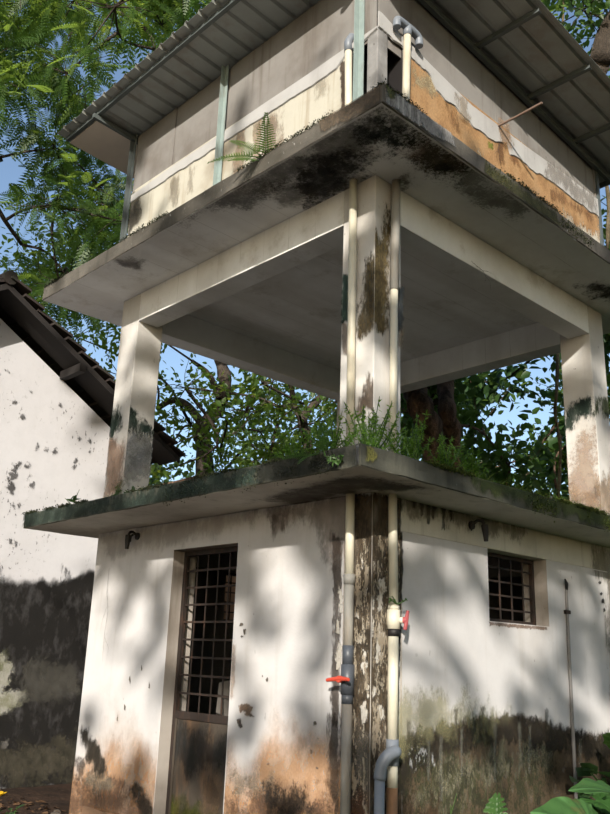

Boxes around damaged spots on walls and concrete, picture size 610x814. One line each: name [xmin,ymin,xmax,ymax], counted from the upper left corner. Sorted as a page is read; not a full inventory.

damp [207,91,530,215]
damp [574,281,610,301]
damp [592,547,610,599]
damp [0,568,107,789]
peeling [335,589,343,670]
peeling [351,535,400,814]
damp [262,477,525,814]
damp [129,783,152,814]
damp [398,713,610,814]